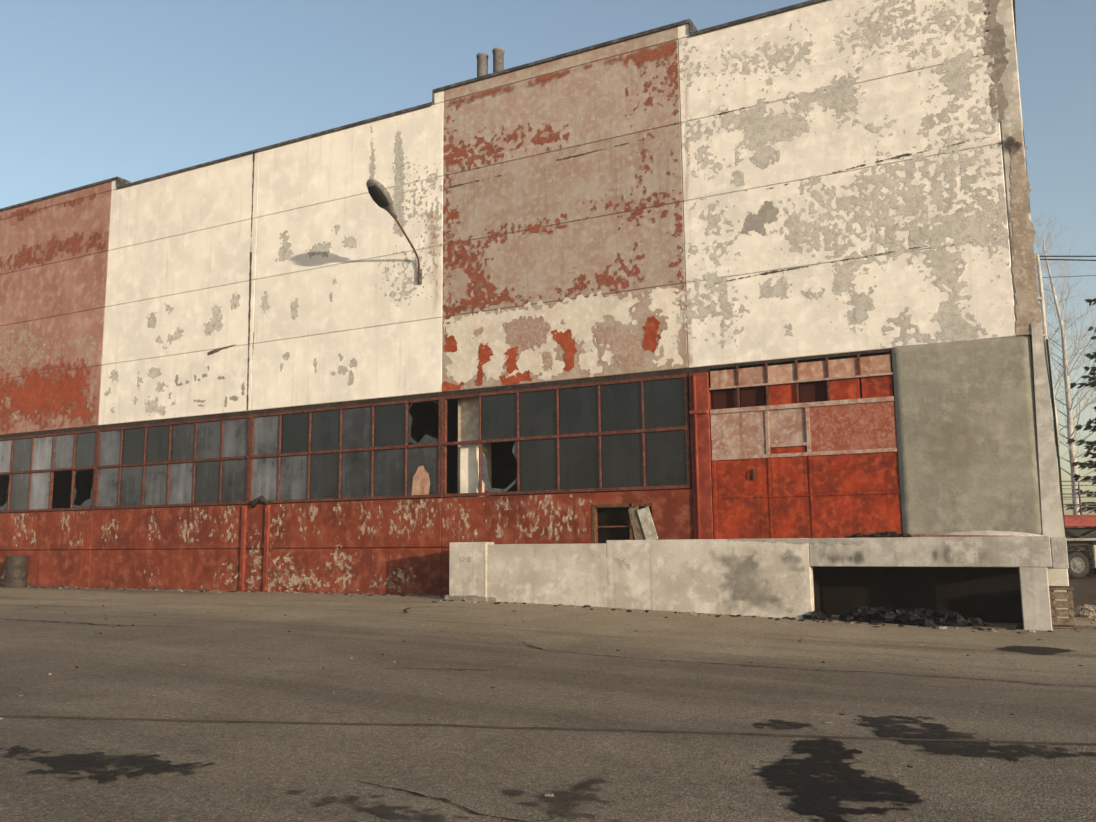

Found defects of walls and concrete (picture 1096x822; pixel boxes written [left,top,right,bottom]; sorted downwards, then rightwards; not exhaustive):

peeling [379,0,1043,391]
peeling [0,232,105,269]
peeling [275,225,357,262]
peeling [146,303,184,350]
peeling [204,292,241,336]
peeling [0,325,100,431]
peeling [104,369,119,413]
peeling [132,366,225,416]
peeling [331,354,357,385]
peeling [11,514,37,547]
peeling [180,506,238,543]
peeling [215,494,591,592]